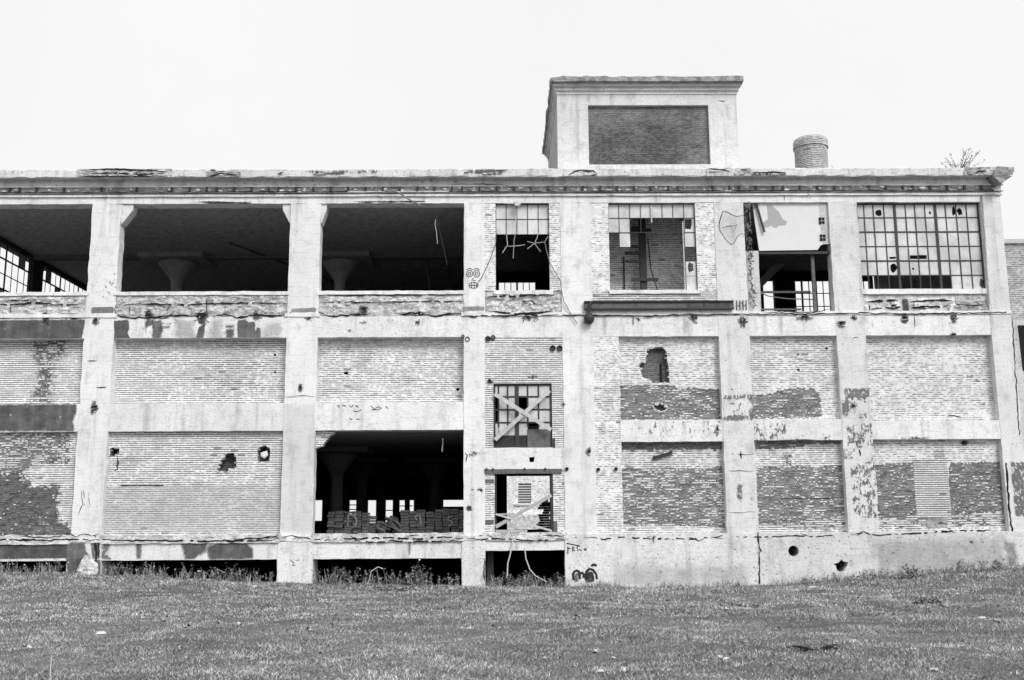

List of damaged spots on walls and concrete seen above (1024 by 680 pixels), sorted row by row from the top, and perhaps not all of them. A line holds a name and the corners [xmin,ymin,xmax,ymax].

water stain [145,319,169,338]
spalling [194,310,209,325]
water stain [226,319,261,338]
spalling [837,297,988,337]
water stain [0,307,130,432]
peeling [620,347,927,542]
peeling [947,461,1024,543]
crack [585,463,1013,584]
water stain [182,543,253,559]